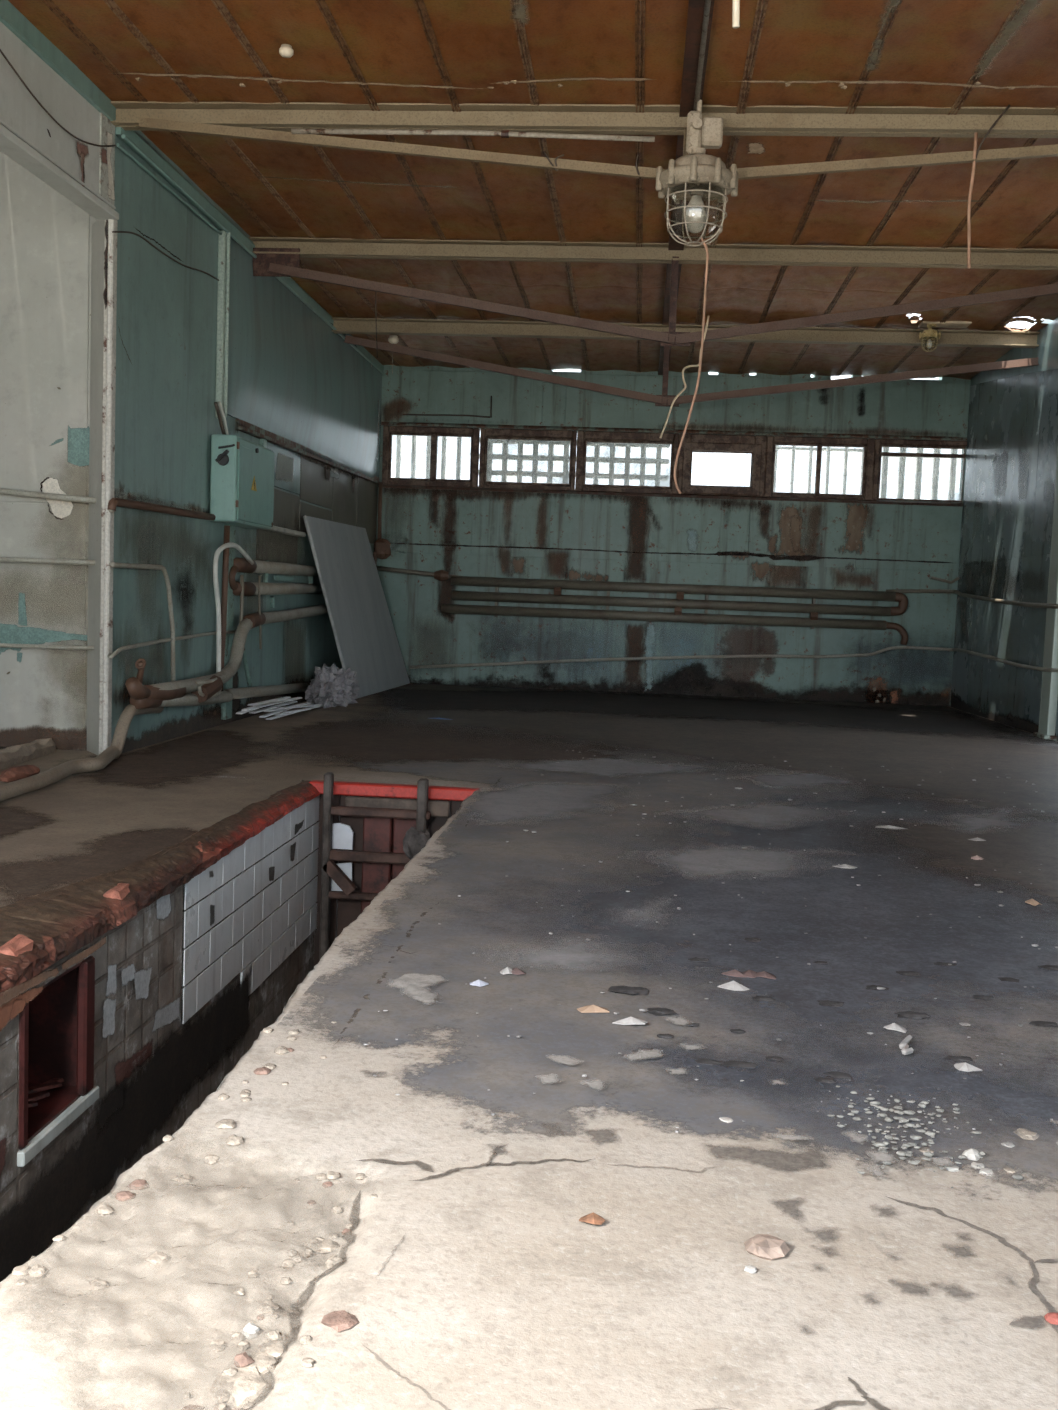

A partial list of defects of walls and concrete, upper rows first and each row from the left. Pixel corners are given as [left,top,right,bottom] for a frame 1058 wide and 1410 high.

corrosion [384,488,659,622]
corrosion [624,625,644,685]
corrosion [718,626,777,689]
spalling [0,795,320,1245]
damp [658,1049,1058,1135]
damp [585,1129,617,1143]
damp [707,1145,826,1171]
spalling [12,1264,48,1286]
spalling [181,1171,378,1410]
crack [244,1144,596,1410]
crack [885,1196,1058,1332]
crack [815,1377,890,1410]